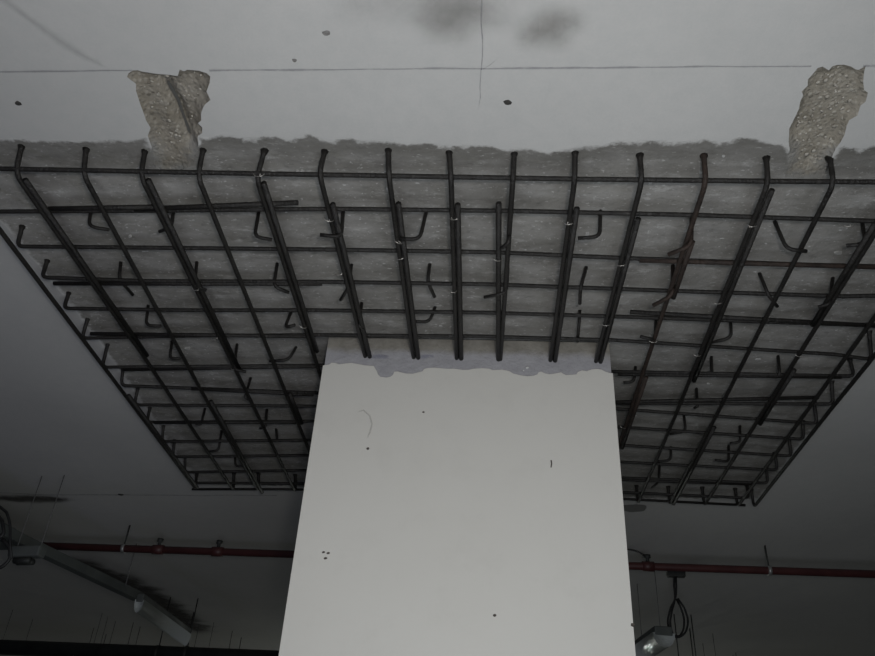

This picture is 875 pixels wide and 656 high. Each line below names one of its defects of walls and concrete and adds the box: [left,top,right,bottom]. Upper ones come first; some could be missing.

spalling [0,65,875,507]